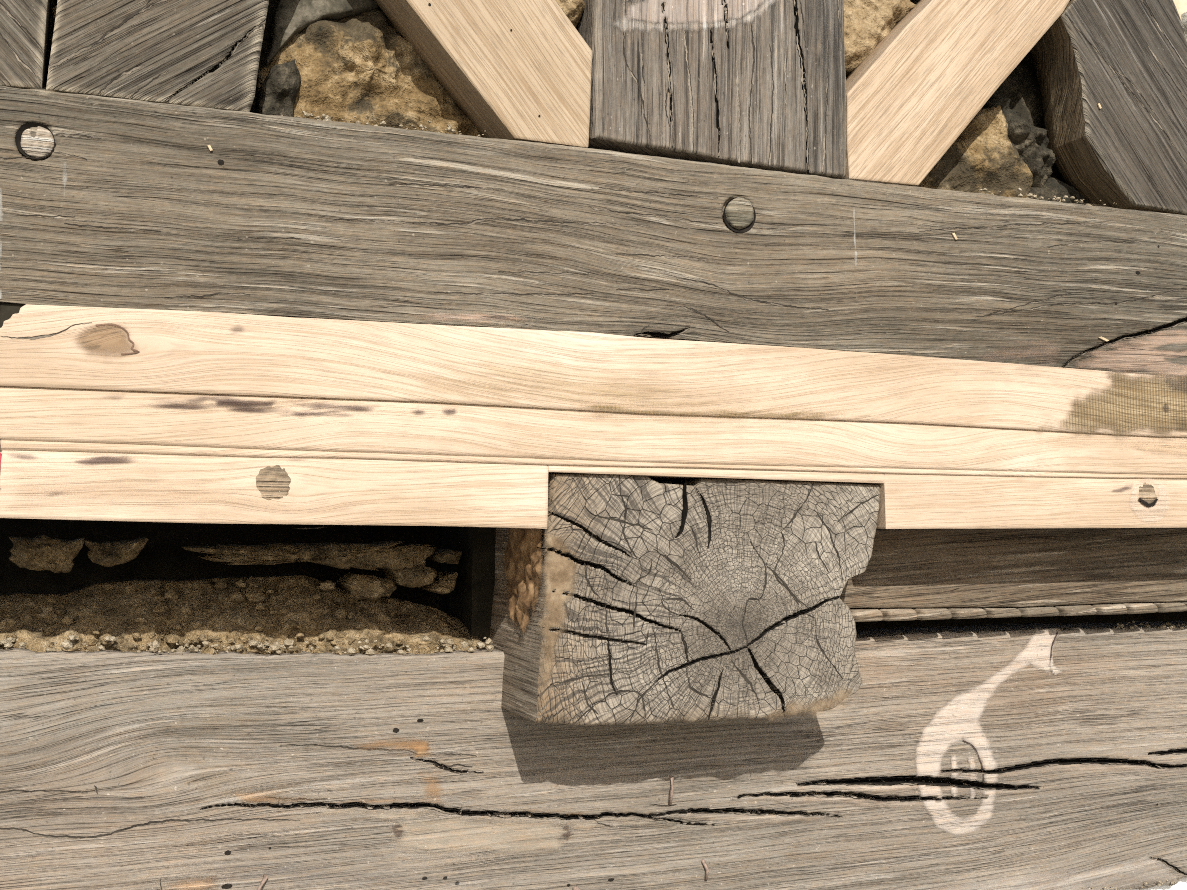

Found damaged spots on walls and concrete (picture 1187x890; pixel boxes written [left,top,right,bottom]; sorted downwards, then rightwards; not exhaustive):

crack [976,288,1187,317]
crack [2,322,92,340]
crack [1062,318,1187,367]
water stain [1064,373,1187,434]
crack [537,475,880,723]
crack [0,744,1187,839]
crack [1149,857,1187,875]